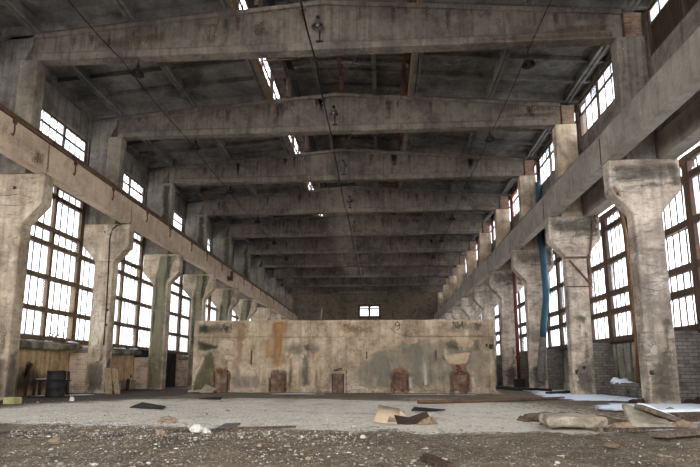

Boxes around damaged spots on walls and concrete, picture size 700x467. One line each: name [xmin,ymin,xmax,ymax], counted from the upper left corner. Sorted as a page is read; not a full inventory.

damp [353,340,487,386]